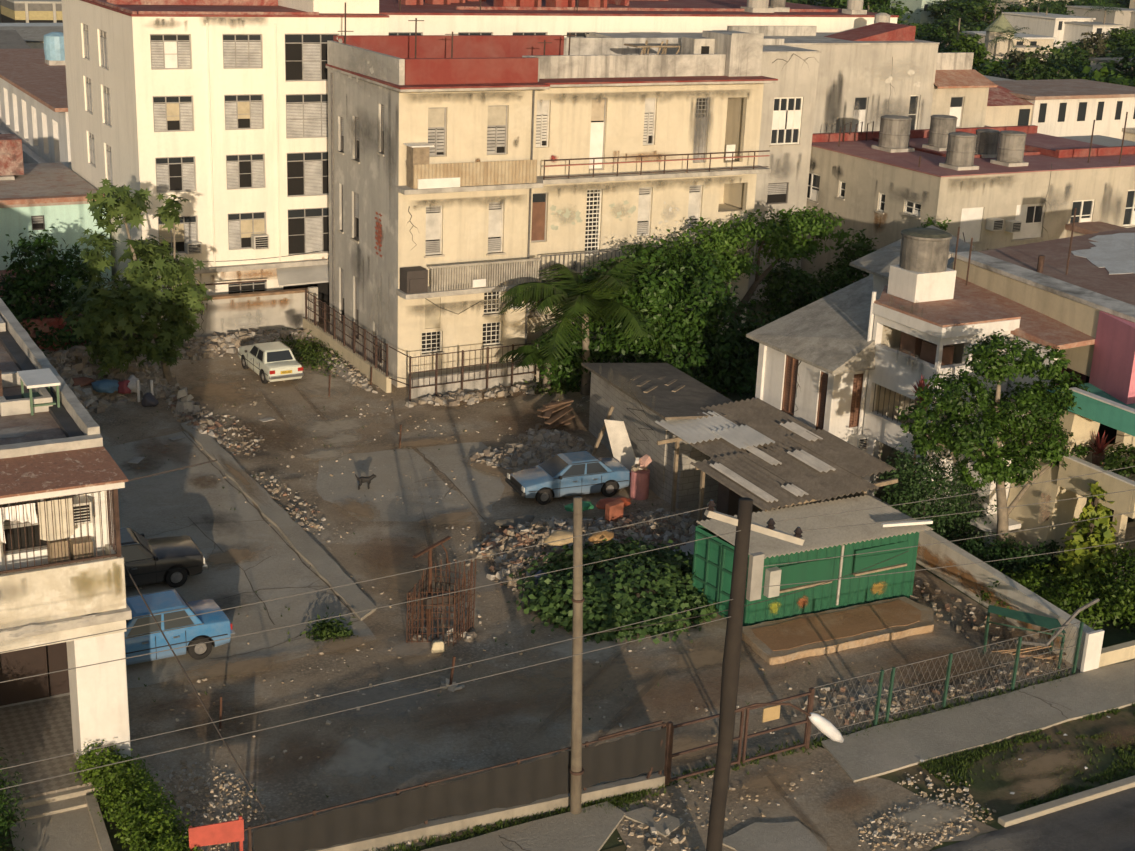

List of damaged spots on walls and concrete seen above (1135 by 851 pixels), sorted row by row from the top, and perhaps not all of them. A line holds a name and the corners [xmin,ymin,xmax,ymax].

water stain [826,75,846,133]